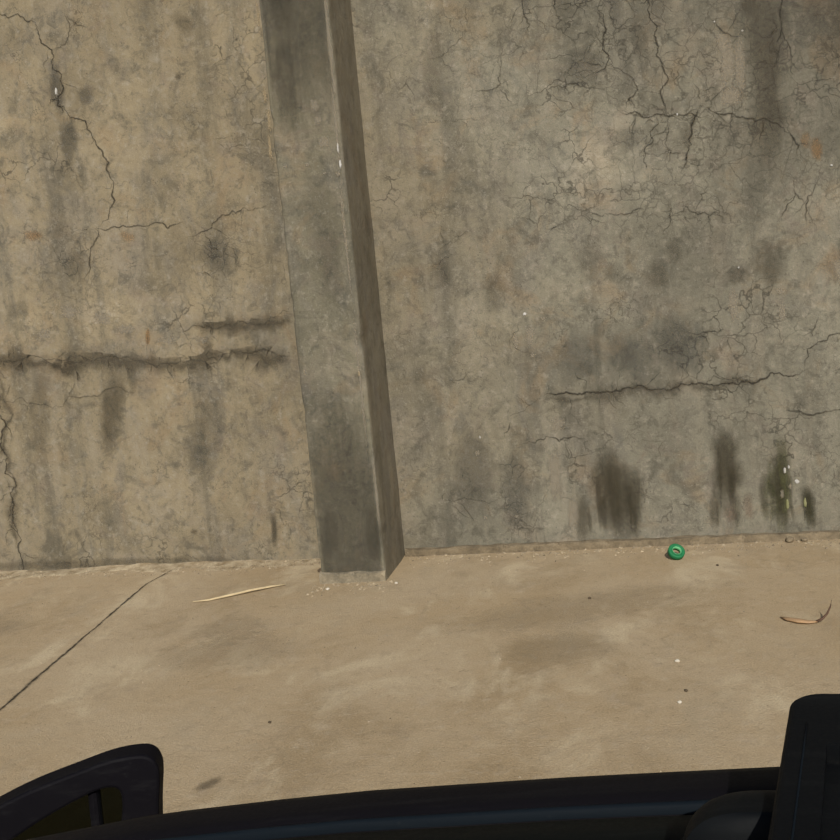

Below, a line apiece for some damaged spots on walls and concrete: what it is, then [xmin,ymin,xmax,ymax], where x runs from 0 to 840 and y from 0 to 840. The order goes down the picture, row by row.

crack [0,13,175,271]
crack [0,320,284,375]
crack [548,333,838,402]
crack [0,397,27,563]
leakage [717,441,738,491]
leakage [772,452,788,518]
leakage [804,493,814,522]